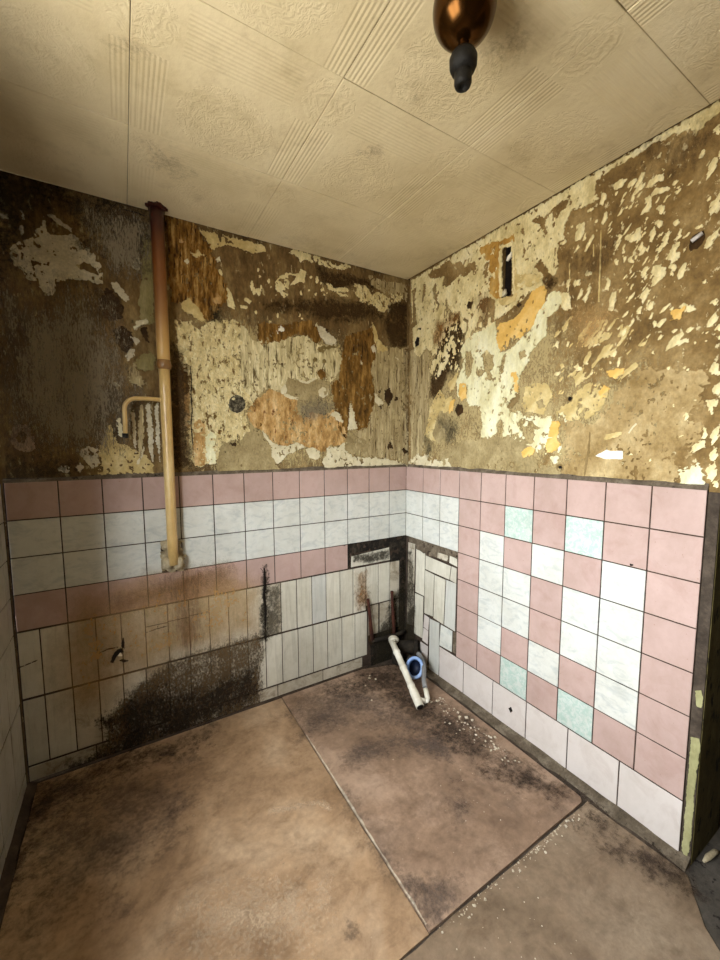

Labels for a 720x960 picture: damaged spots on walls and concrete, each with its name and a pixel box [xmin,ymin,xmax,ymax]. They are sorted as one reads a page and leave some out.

flaking render [9,211,156,388]
flaking render [174,99,720,488]
flaking render [58,425,154,475]
damp [260,564,281,642]
corrosion [356,571,367,606]
peeling [343,535,458,665]
damp [13,745,184,884]